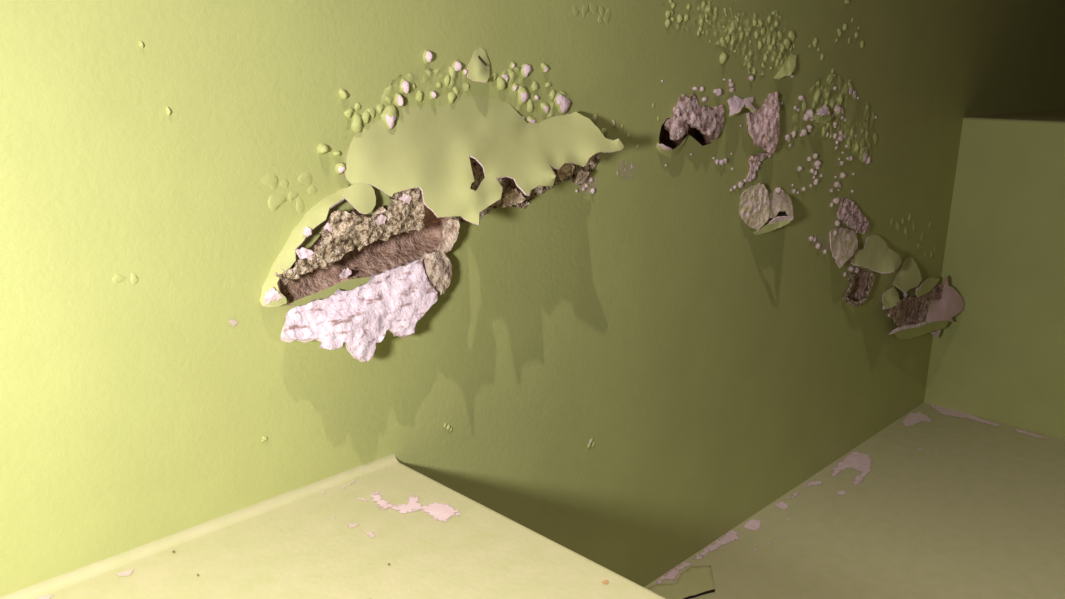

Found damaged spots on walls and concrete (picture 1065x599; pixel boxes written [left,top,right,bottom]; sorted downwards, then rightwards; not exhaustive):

peeling [774,54,797,79]
spalling [652,78,780,192]
spalling [260,47,639,362]
spalling [830,198,964,340]
flaking render [356,491,460,522]
flaking render [775,451,872,520]
crack [647,565,715,599]
flaking render [656,519,761,584]